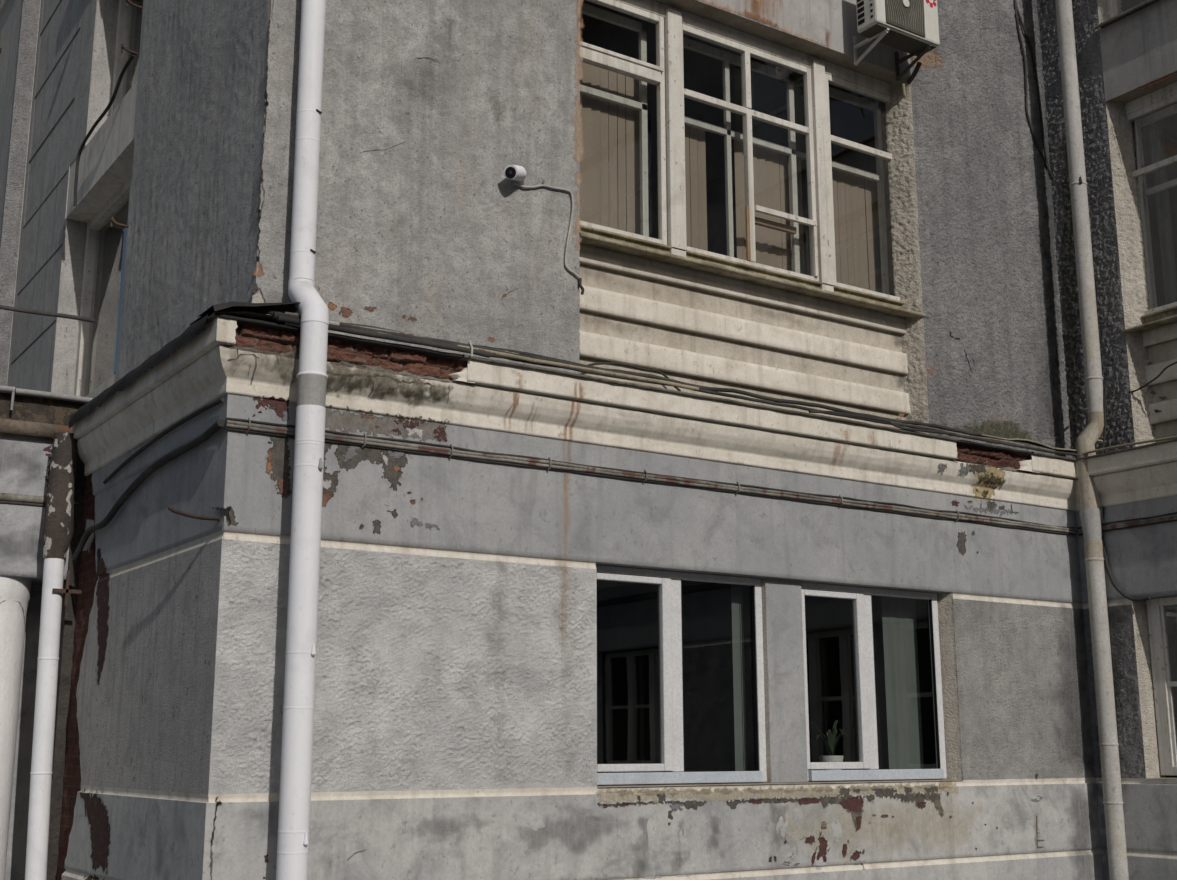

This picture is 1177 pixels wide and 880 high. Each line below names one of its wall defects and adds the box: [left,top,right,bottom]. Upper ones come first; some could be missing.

crack [256,0,274,257]
corrosion [574,0,583,204]
spalling [224,321,300,358]
spalling [327,339,475,386]
peeling [253,395,290,420]
peeling [266,436,292,498]
peeling [322,405,450,506]
spalling [938,444,1040,516]
peeling [359,502,398,534]
crack [210,796,222,880]
peeling [597,793,707,825]
peeling [726,786,952,868]